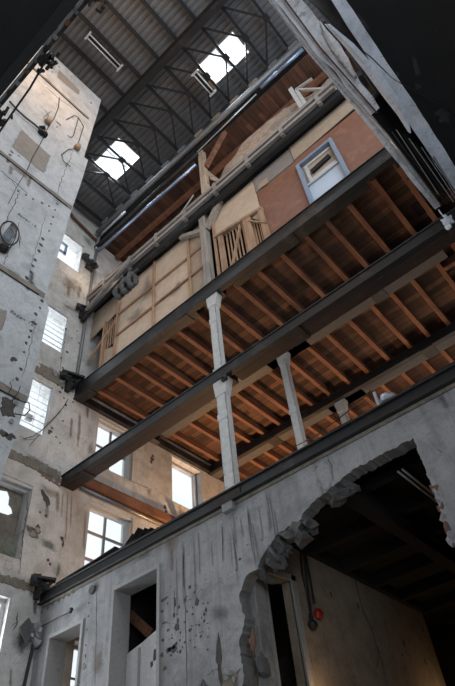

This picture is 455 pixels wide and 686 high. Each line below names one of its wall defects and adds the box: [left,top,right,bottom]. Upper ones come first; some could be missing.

crack [3,172,46,275]
spalling [0,397,19,424]
spalling [26,524,41,539]
spalling [259,518,319,585]
spalling [322,481,361,508]
spalling [429,484,455,548]